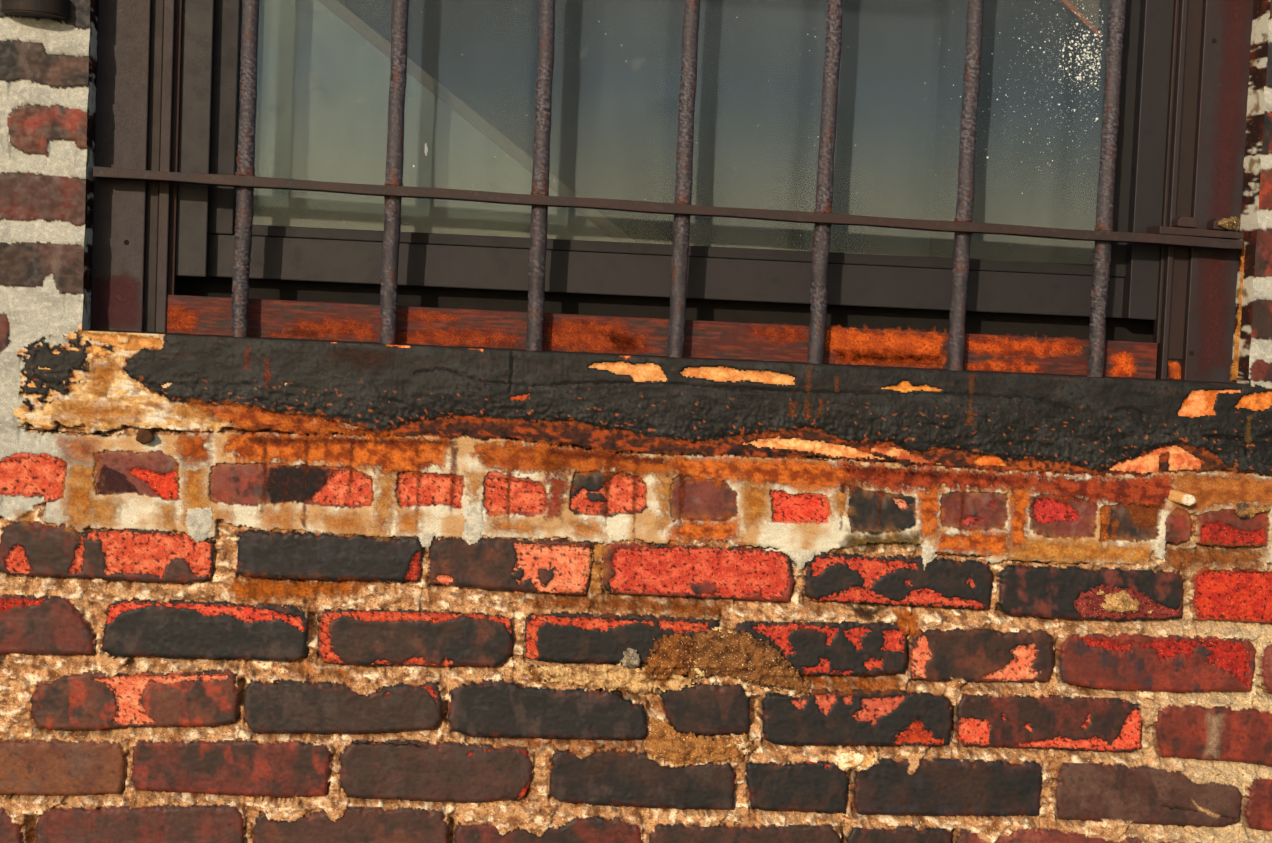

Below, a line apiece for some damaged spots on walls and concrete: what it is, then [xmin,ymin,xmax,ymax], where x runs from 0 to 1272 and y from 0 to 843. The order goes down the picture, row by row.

rust [825,327,945,367]
rust [965,337,1077,376]
rust [61,360,140,422]
flaking render [12,323,1246,478]
peeling [1178,390,1272,418]
spalling [0,454,67,502]
rust [61,440,122,527]
rust [160,432,211,527]
spalling [397,471,463,508]
spalling [570,475,647,515]
rust [170,402,1272,617]
spalling [770,490,830,523]